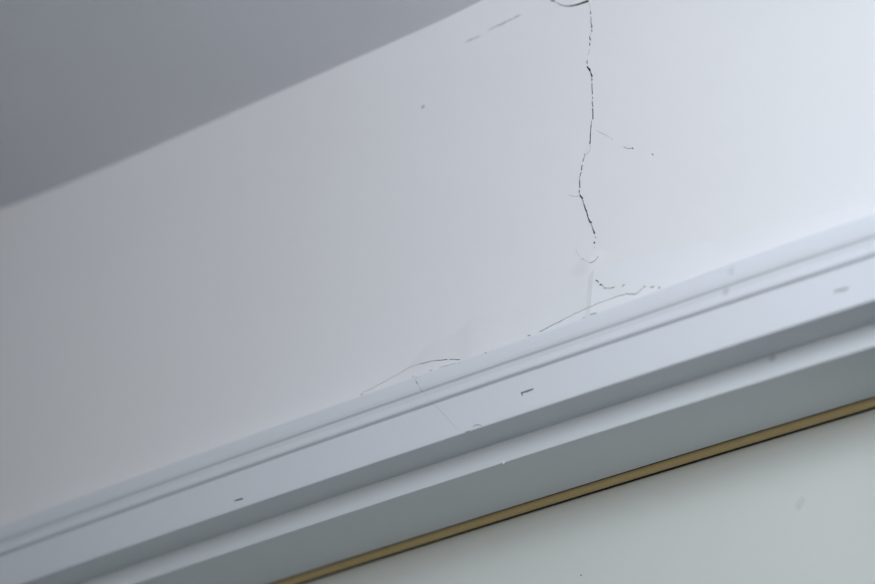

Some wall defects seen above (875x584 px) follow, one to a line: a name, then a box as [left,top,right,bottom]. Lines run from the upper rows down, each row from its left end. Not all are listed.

crack [550,0,653,263]
crack [540,287,644,332]
crack [361,359,460,430]